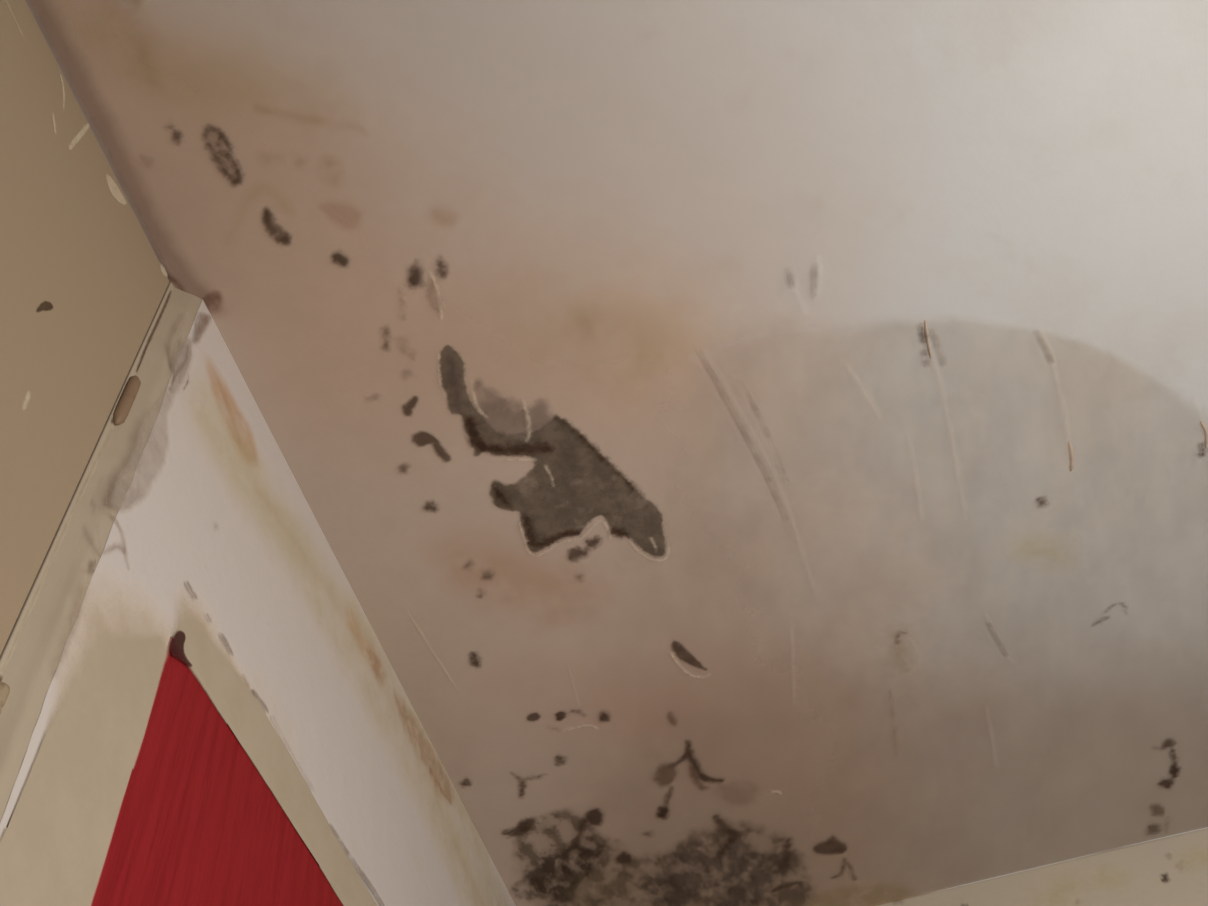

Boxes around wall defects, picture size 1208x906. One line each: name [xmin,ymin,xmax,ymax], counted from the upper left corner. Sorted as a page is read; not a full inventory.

damp [404,397,418,416]
damp [413,432,450,462]
damp [674,742,723,782]
damp [657,791,672,819]
damp [504,809,810,906]